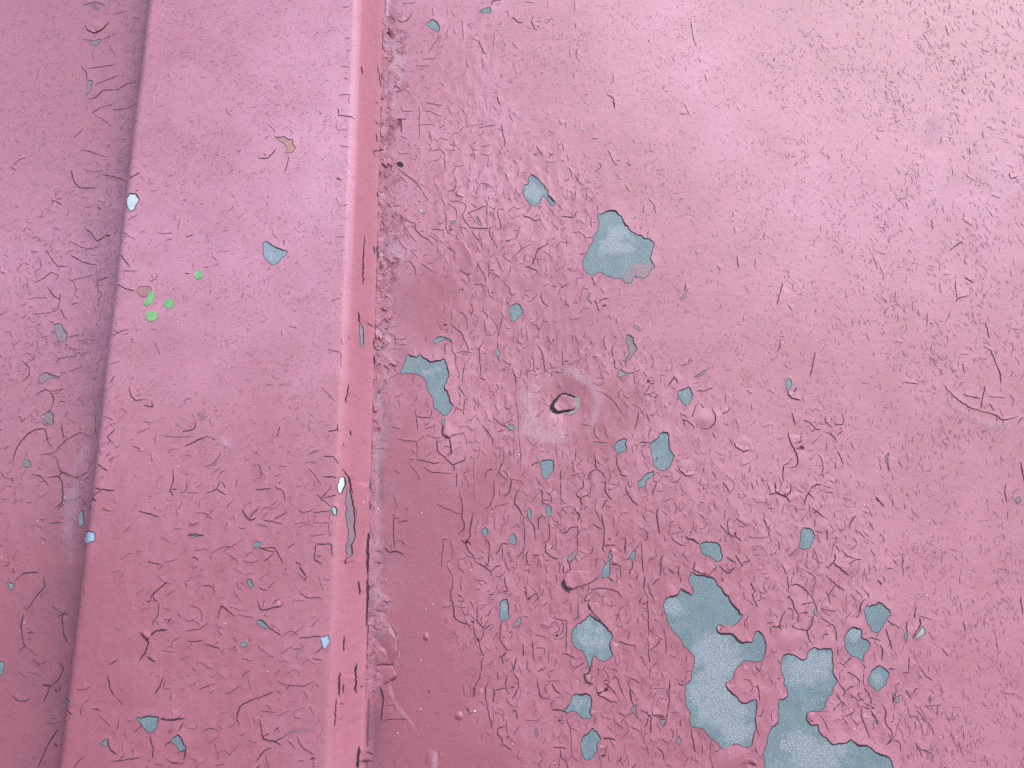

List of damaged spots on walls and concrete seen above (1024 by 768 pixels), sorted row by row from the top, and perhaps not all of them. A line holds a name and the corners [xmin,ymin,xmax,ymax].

peeling [518,165,565,211]
peeling [257,235,294,270]
peeling [576,198,663,301]
crack [0,0,411,768]
peeling [394,329,466,438]
crack [356,0,1024,768]
peeling [609,418,683,491]
spalling [329,473,366,564]
peeling [559,546,639,766]
peeling [627,531,904,768]